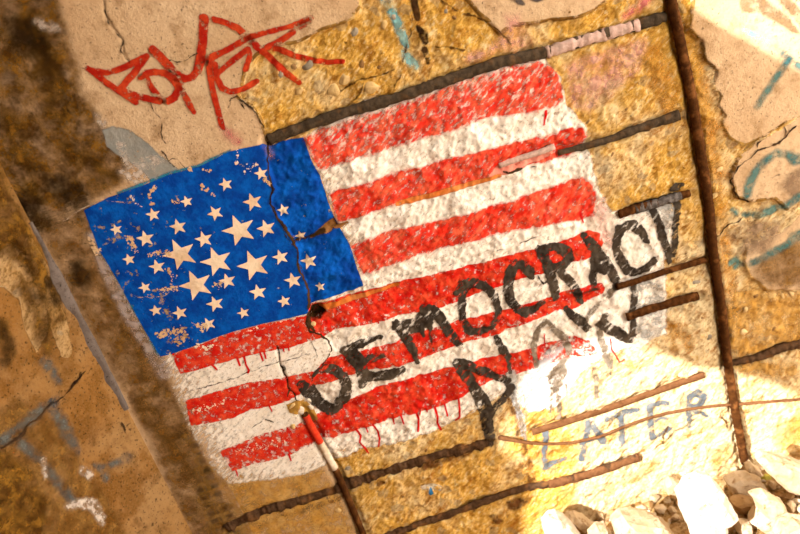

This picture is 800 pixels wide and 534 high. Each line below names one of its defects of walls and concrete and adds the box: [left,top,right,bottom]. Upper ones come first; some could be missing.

crack [150,103,185,168]
crack [197,95,332,401]
spalling [236,0,800,534]
crack [0,371,86,449]
corrosion [421,452,471,471]
corrosion [507,397,567,483]
corrosion [506,498,529,510]